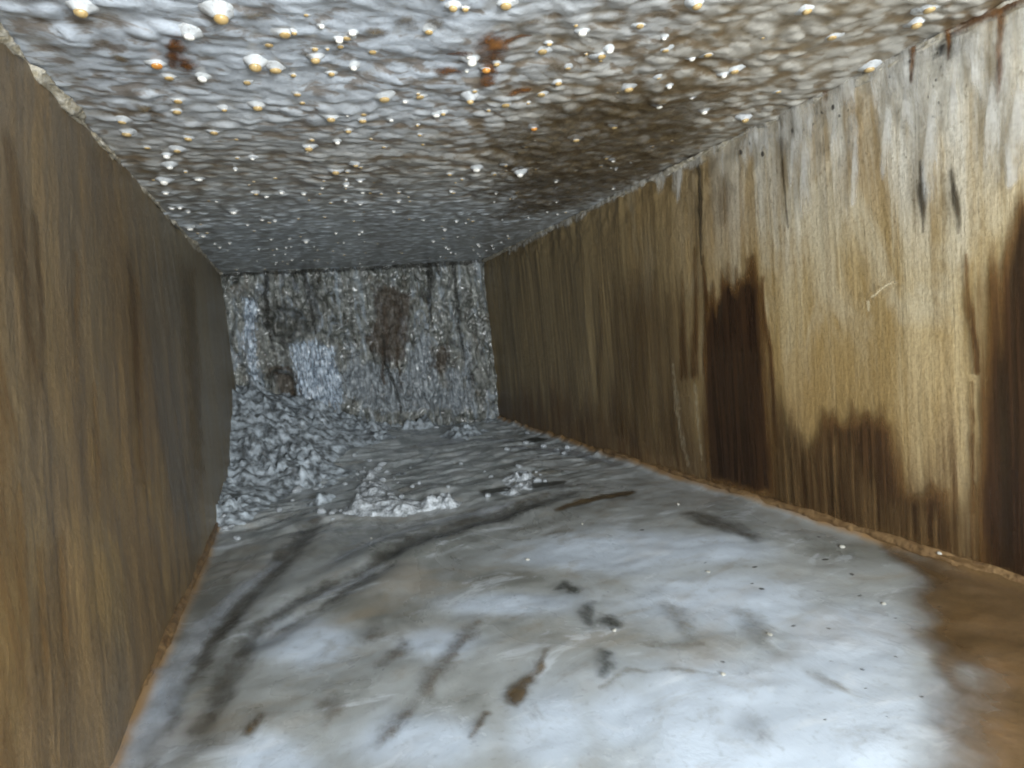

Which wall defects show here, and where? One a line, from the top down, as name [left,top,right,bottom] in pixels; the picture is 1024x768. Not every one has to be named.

leakage [0,22,121,164]
rust [167,39,194,71]
leakage [482,91,821,265]
leakage [831,0,1024,232]
leakage [241,298,259,381]
leakage [289,331,478,416]
leakage [777,401,938,549]